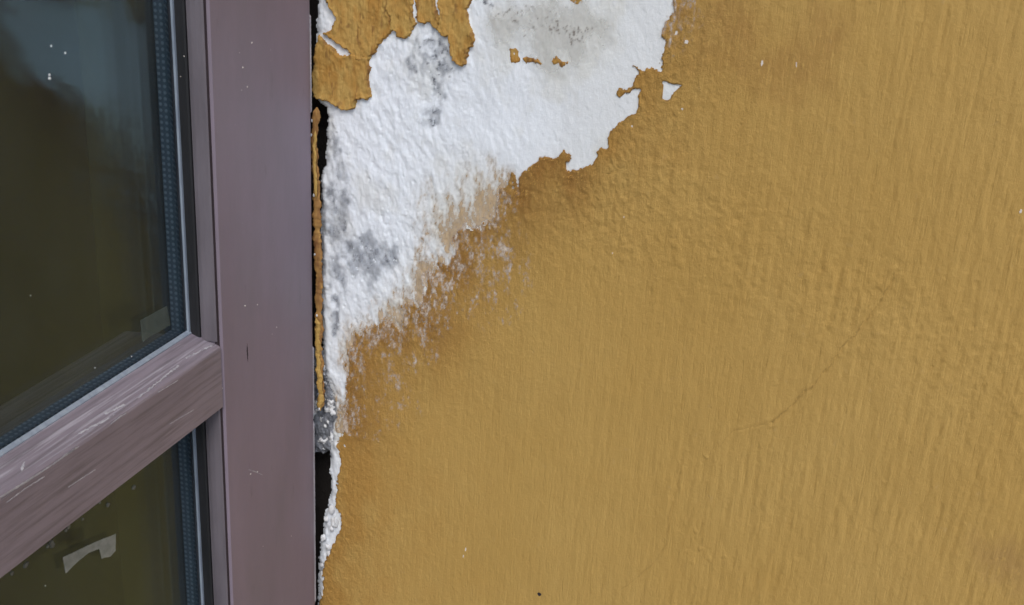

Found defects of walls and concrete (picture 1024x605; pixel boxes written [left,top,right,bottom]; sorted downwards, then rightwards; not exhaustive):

peeling [312,0,694,605]